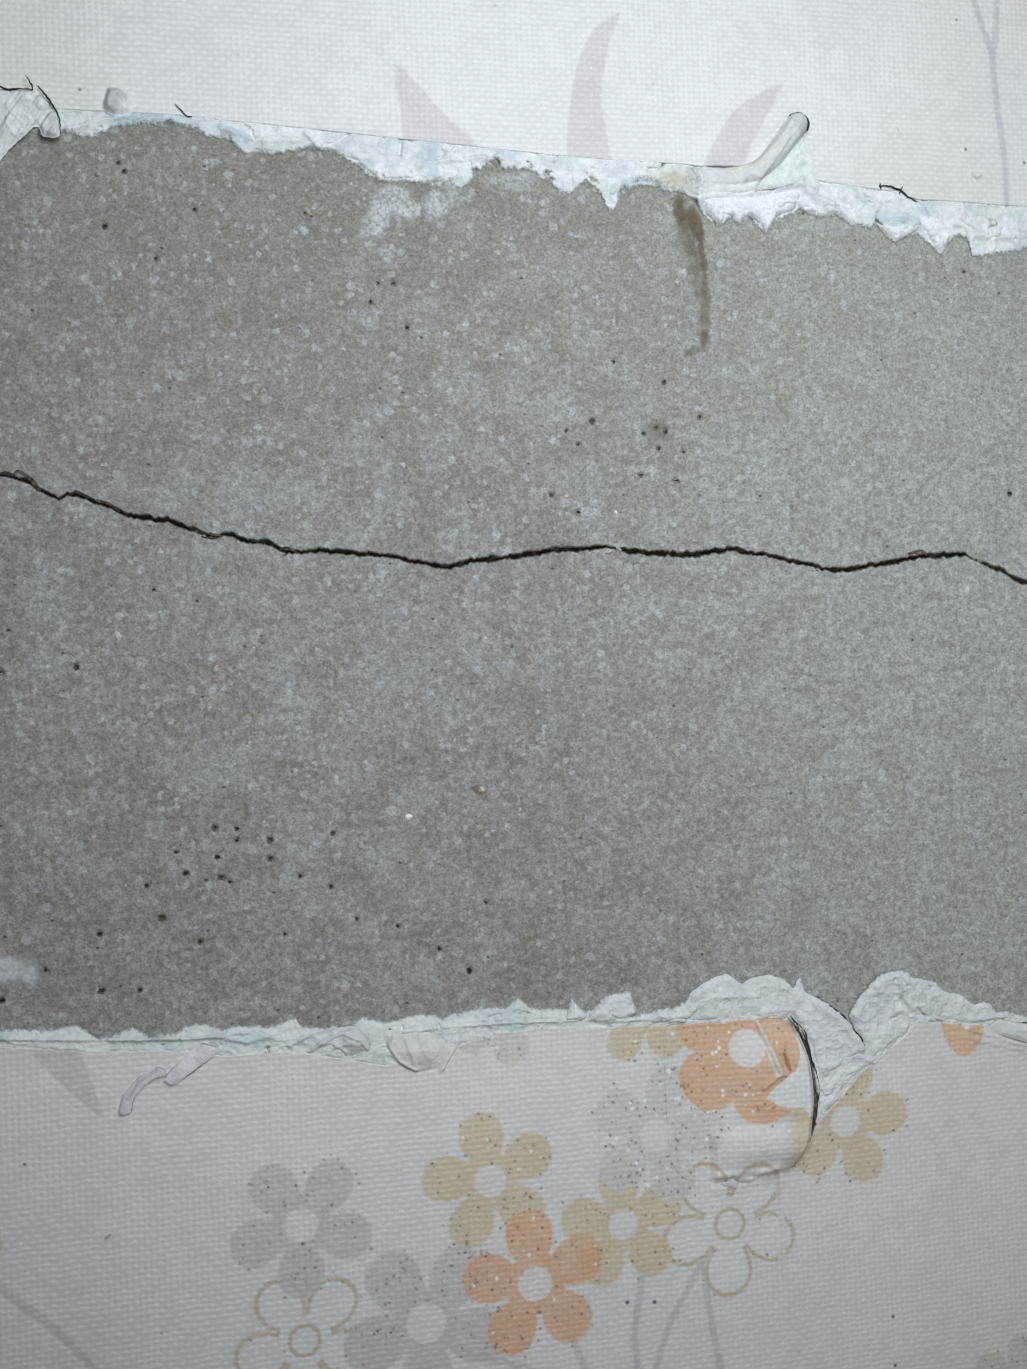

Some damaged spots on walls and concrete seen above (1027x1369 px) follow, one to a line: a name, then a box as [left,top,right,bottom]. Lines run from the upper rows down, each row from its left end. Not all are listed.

peeling [0,75,61,161]
peeling [102,87,133,116]
peeling [690,112,820,195]
crack [0,470,1027,585]
peeling [118,1044,216,1115]
peeling [816,970,1027,1123]